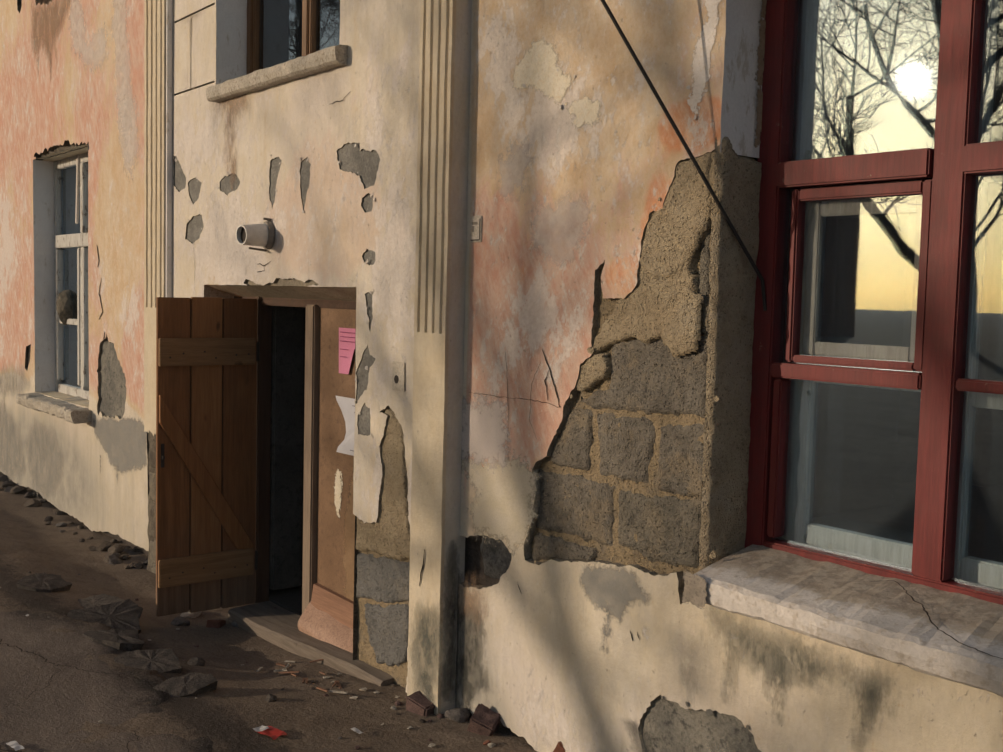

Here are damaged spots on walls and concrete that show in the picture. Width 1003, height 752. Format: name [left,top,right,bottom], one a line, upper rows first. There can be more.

spalling [34,140,89,161]
peeling [173,156,204,244]
peeling [269,157,282,207]
peeling [299,156,311,213]
peeling [336,142,380,212]
spalling [459,0,767,609]
spalling [97,335,126,419]
spalling [353,345,410,688]
leakage [581,566,648,647]
leakage [728,630,824,678]
crack [870,580,1003,659]
spalling [638,695,761,752]